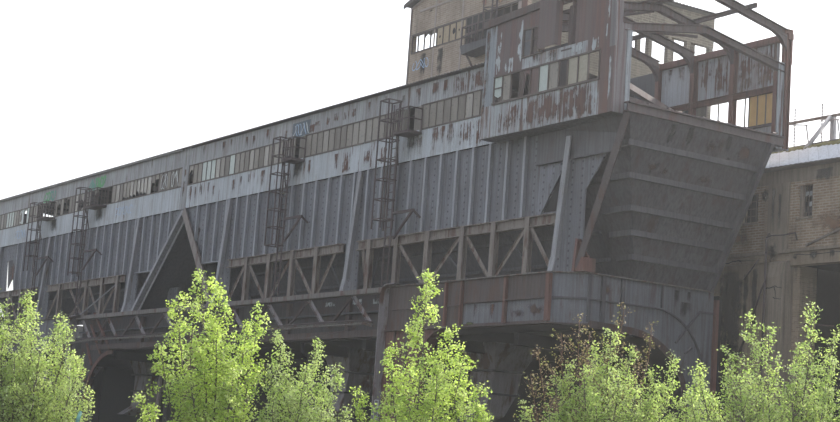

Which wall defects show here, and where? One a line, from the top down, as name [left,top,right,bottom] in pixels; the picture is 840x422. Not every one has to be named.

corrosion [432,124,454,145]